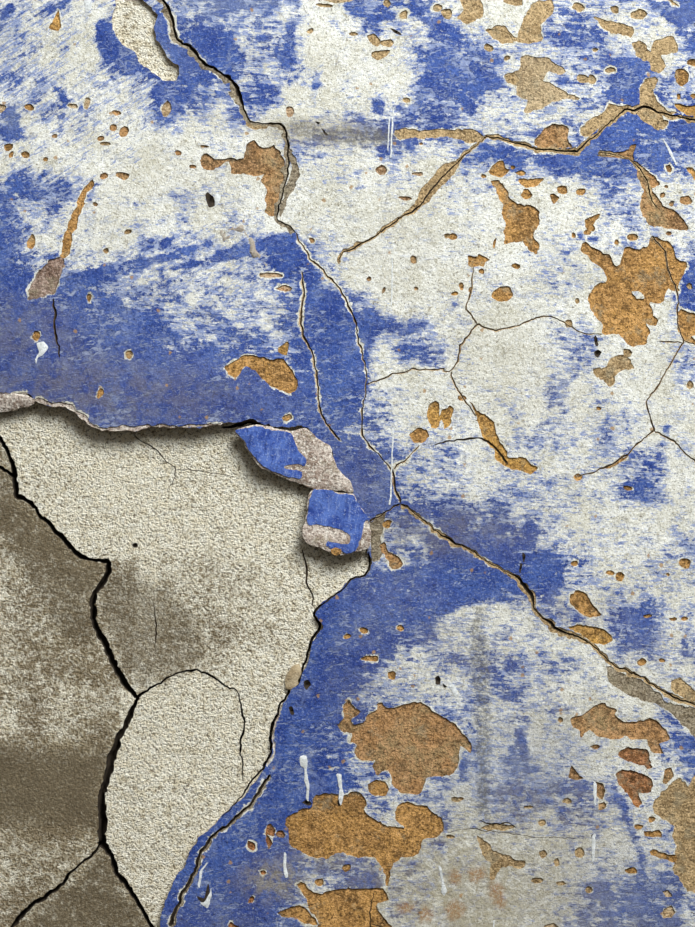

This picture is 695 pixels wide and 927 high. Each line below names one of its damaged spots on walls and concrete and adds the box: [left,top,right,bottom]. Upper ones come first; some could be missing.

spalling [112,0,179,81]
crack [52,299,60,358]
peeling [189,120,300,217]
crack [157,0,695,708]
peeling [481,161,544,254]
peeling [572,144,695,387]
crack [0,434,371,927]
spalling [0,392,403,927]
peeling [265,700,472,927]
crack [369,893,381,927]
crack [449,820,575,839]
peeling [558,703,695,893]